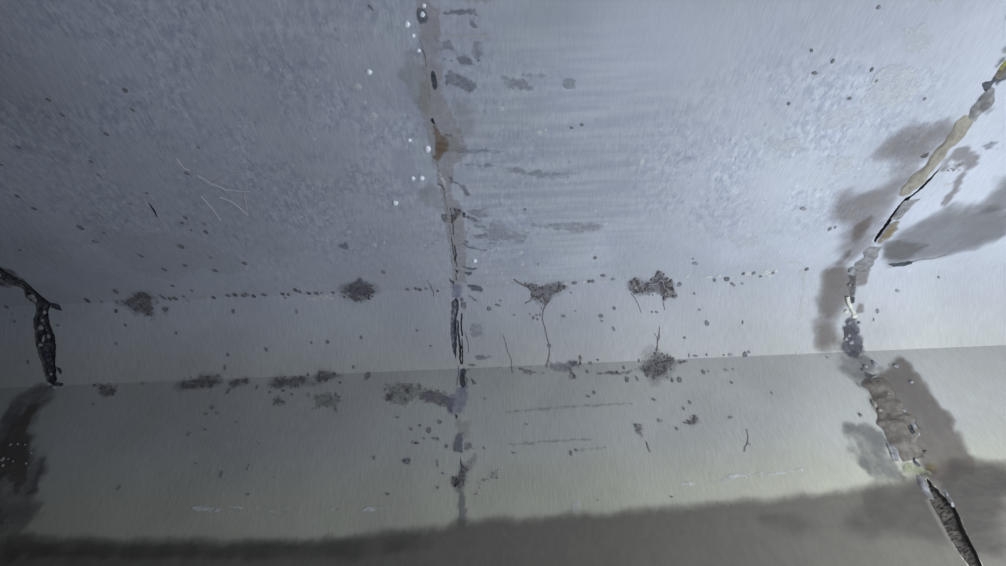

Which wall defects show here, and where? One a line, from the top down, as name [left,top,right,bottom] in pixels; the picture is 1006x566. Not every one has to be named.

crack [427,180,458,297]
damp [840,191,891,237]
damp [887,191,1006,255]
damp [818,267,869,348]
crack [456,313,469,386]
damp [644,349,687,380]
crack [452,461,472,486]
damp [0,359,1006,566]